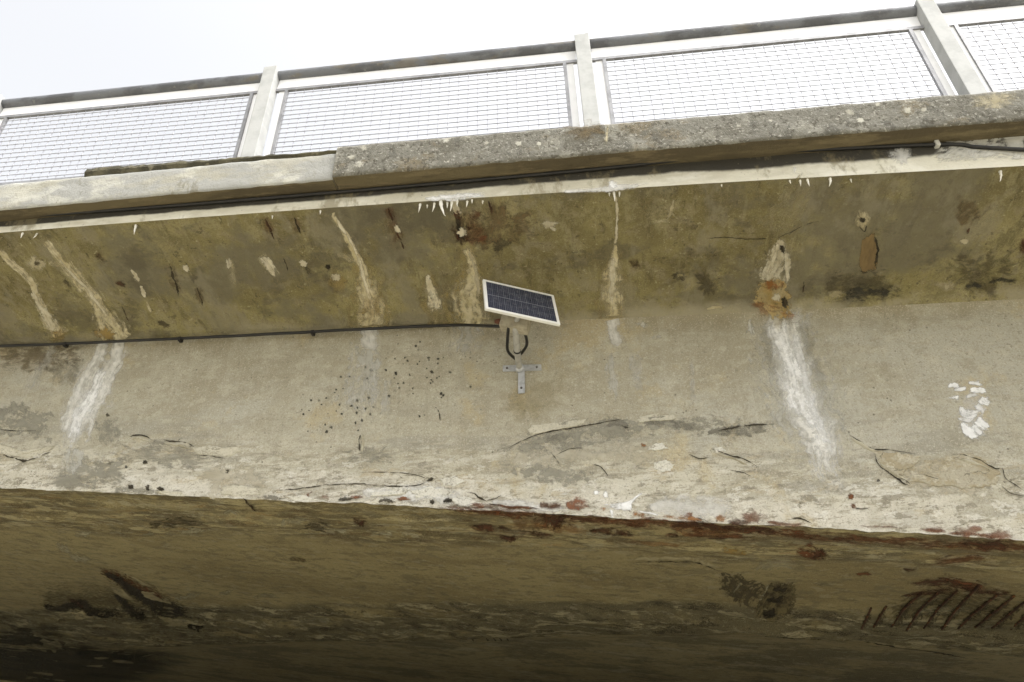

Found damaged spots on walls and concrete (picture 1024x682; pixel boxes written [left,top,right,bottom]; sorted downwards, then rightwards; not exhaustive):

spalling [855,212,880,273]
damp [565,181,638,395]
damp [301,212,451,431]
damp [0,240,131,474]
crack [275,472,434,491]
crack [850,435,938,485]
crack [955,454,1023,496]
rust [440,497,1024,565]
spalling [43,568,216,634]
spalling [719,573,797,622]
spalling [861,577,1024,631]